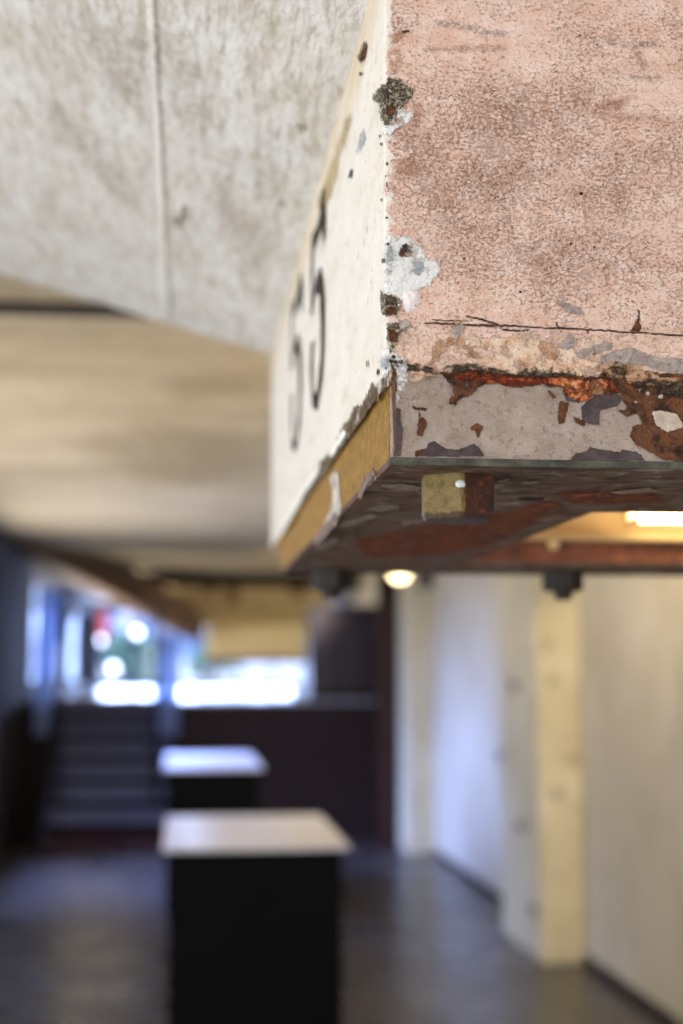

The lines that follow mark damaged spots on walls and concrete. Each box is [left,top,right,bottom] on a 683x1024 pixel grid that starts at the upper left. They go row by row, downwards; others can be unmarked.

spalling [372,77,413,146]
crack [424,315,683,337]
peeling [279,235,441,551]
rust [391,361,683,462]
peeling [565,394,622,425]
peeling [415,441,484,457]
peeling [571,446,644,461]